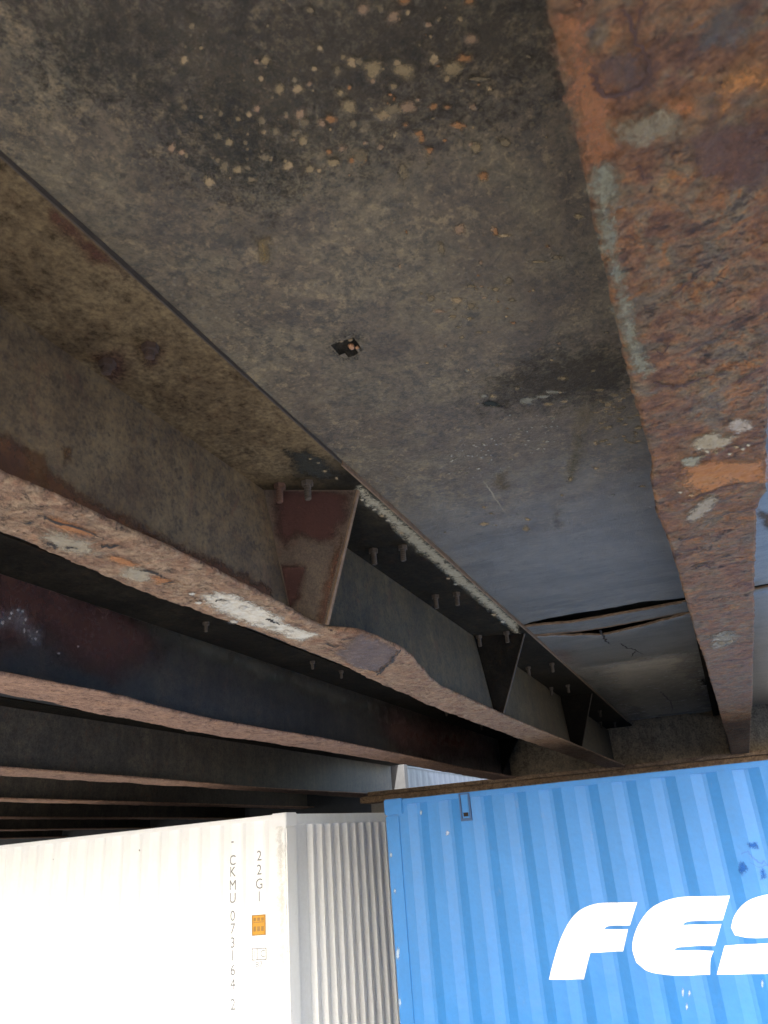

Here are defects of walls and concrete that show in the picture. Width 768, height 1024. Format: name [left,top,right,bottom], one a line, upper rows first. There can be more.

damp [0,0,562,208]
corrosion [551,2,623,175]
spalling [325,330,364,361]
damp [486,347,629,414]
corrosion [0,436,273,597]
corrosion [274,491,353,623]
corrosion [680,457,768,497]
corrosion [0,574,158,684]
crack [525,601,685,657]